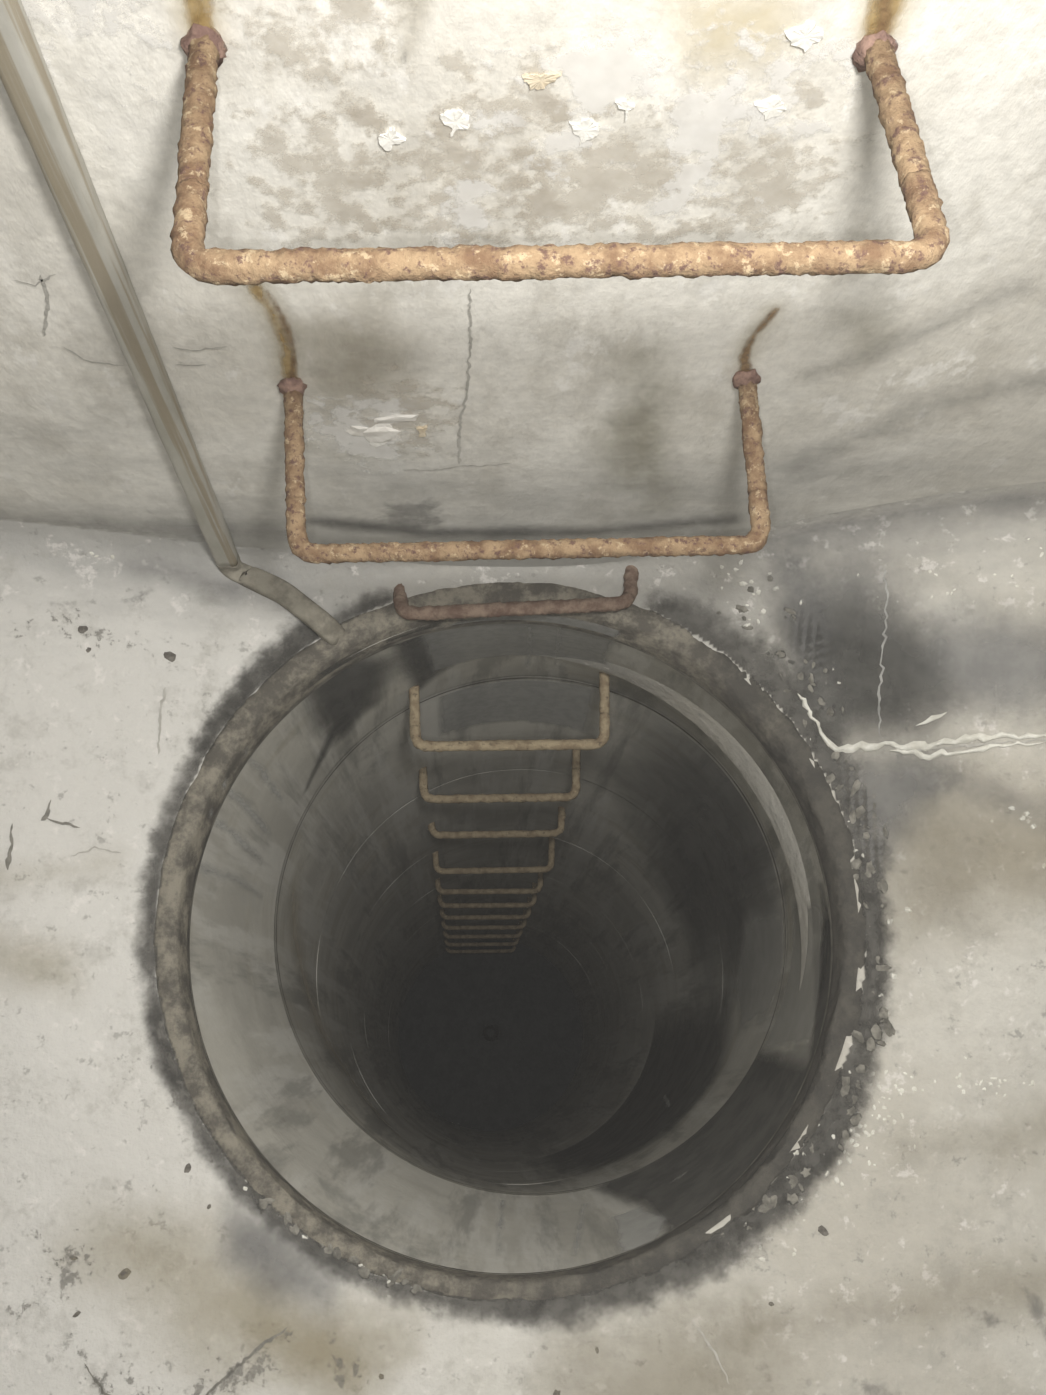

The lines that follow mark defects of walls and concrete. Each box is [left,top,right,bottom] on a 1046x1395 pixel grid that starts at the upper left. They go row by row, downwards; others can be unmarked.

corrosion [186,0,211,28]
damp [702,8,775,45]
corrosion [867,0,901,34]
corrosion [251,285,296,378]
crack [798,569,1046,760]
damp [137,572,1046,1326]
crack [84,1363,110,1395]
crack [206,1327,287,1395]